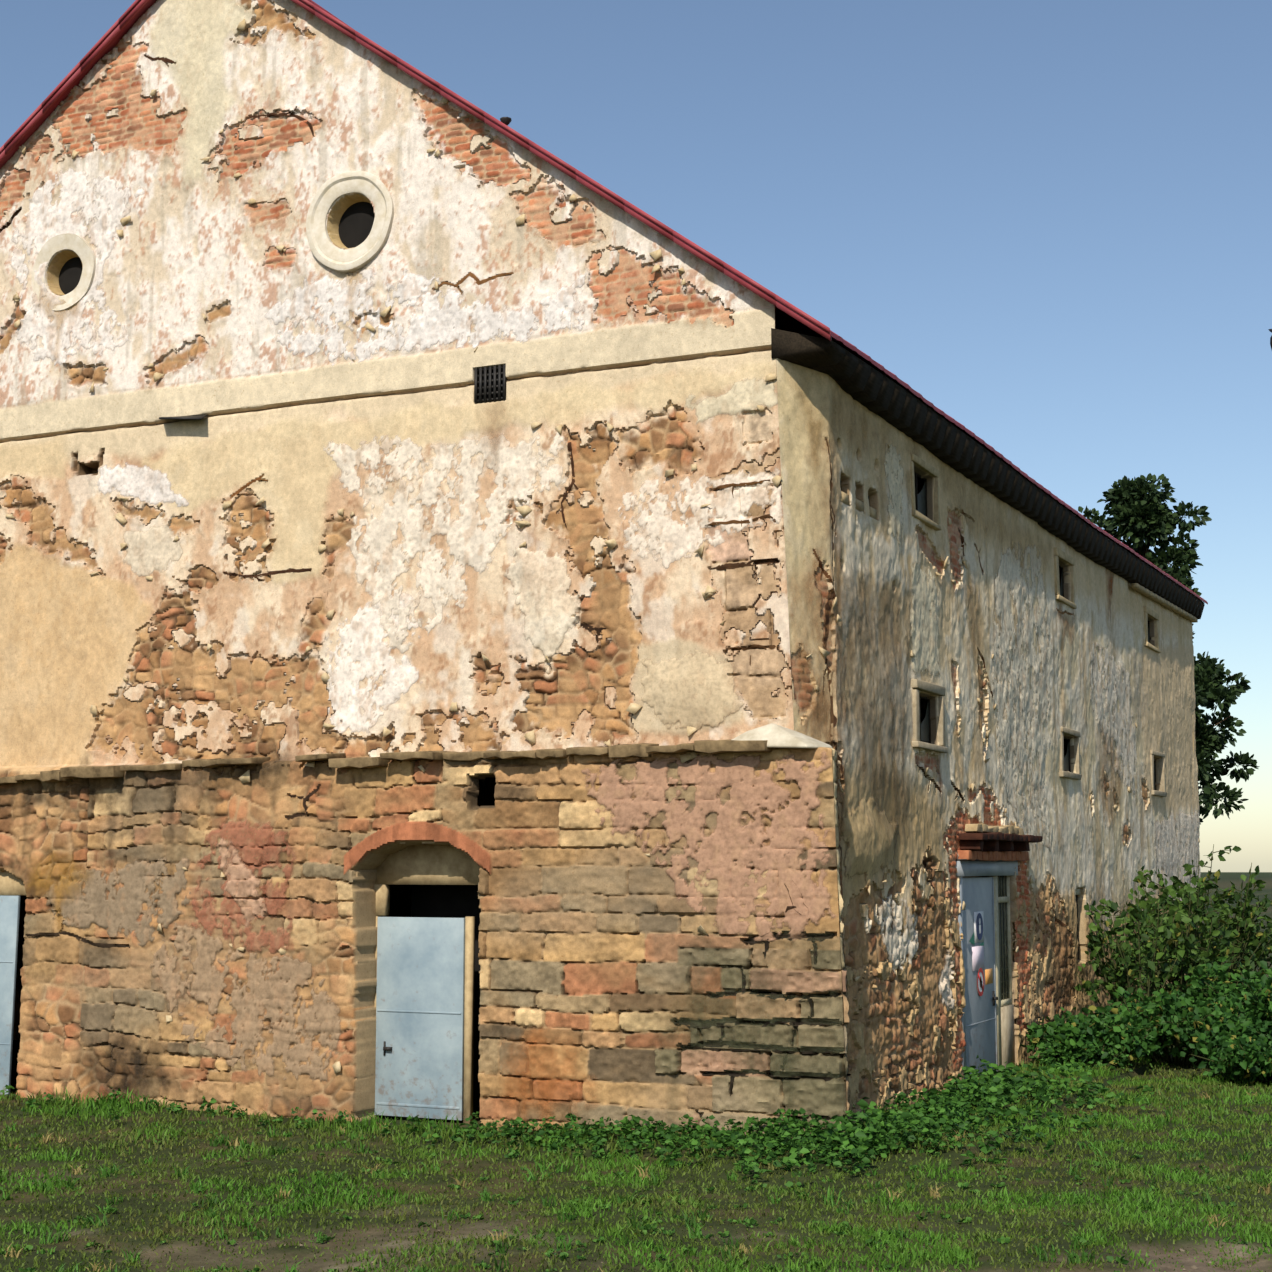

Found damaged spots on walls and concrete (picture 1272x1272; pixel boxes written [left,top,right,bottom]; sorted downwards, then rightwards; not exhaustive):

flaking render [0,40,187,393]
flaking render [199,110,322,185]
crack [433,272,514,293]
flaking render [263,90,734,365]
flaking render [0,474,106,577]
flaking render [45,373,1055,1113]
crack [708,479,773,532]
crack [712,558,779,581]
crack [724,644,779,665]
crack [813,438,844,782]
leakage [828,584,905,771]
crack [674,880,851,1096]